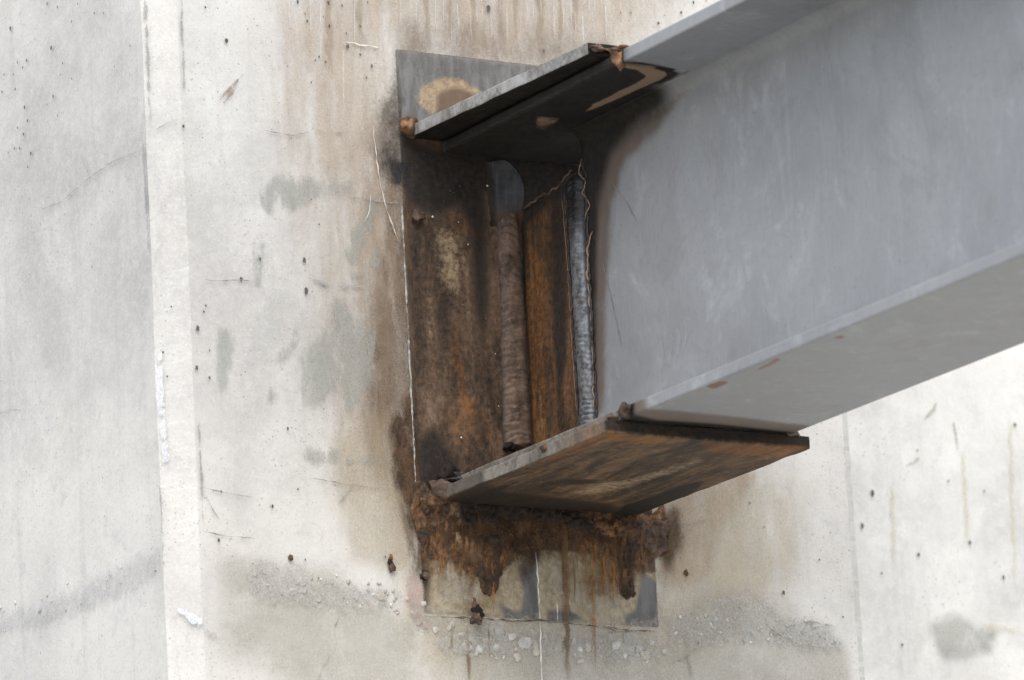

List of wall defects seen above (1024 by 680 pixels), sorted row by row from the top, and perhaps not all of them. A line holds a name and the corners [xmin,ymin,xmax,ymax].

leakage [305,0,418,469]
leakage [450,0,630,57]
corrosion [370,177,747,668]